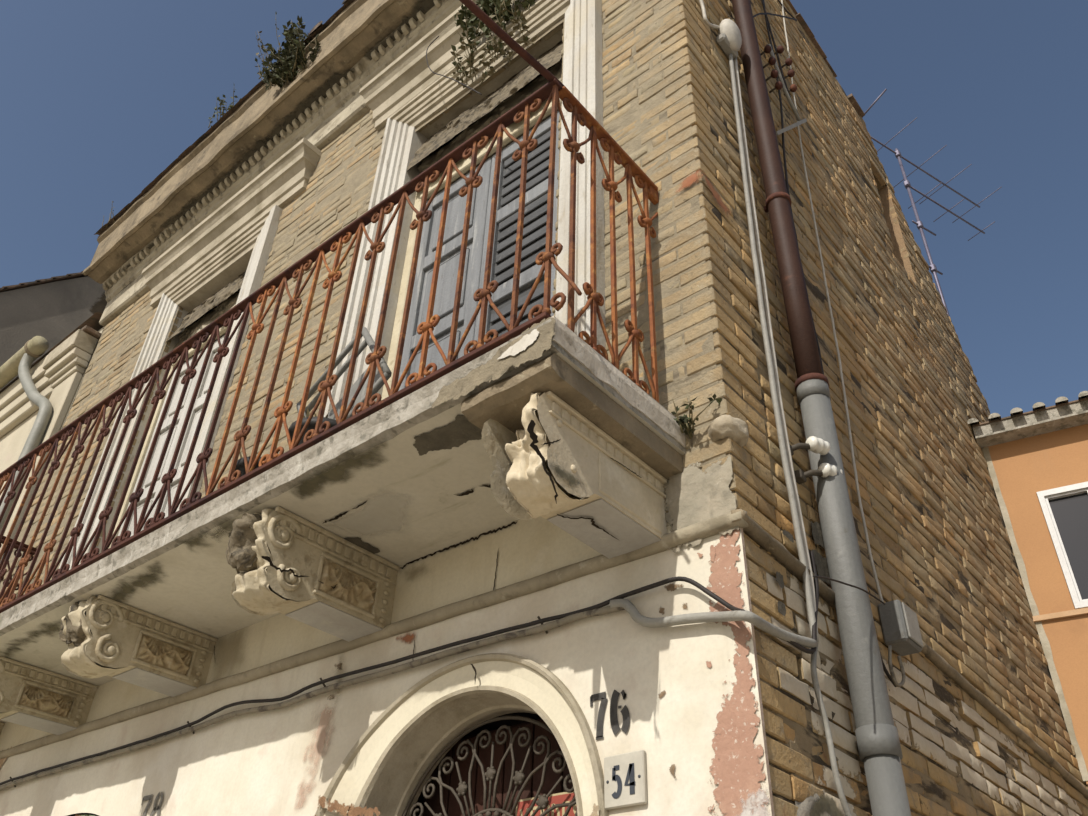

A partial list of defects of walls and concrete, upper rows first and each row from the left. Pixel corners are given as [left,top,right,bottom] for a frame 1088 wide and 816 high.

spalling [431,317,556,409]
spalling [413,415,482,456]
crack [527,420,617,539]
crack [261,556,338,589]
crack [401,522,517,590]
peeling [697,529,769,816]
flaking render [315,795,380,816]